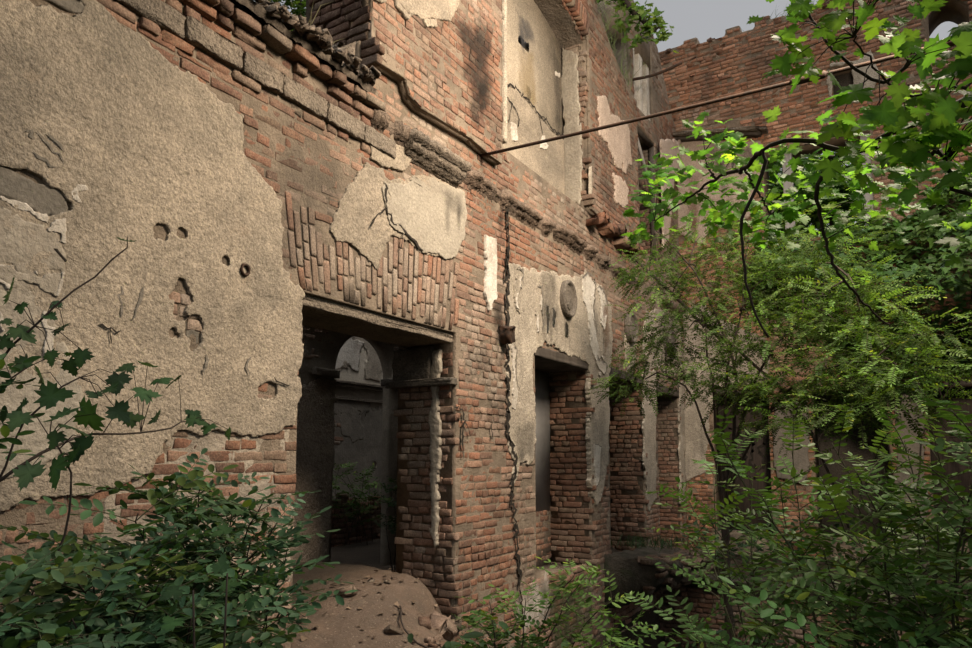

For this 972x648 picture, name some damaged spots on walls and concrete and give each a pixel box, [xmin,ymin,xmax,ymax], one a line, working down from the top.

peeling [47,0,84,13]
peeling [0,166,88,244]
crack [370,184,423,250]
peeling [535,284,546,345]
peeling [582,271,608,376]
crack [454,208,523,615]
peeling [511,344,520,410]
flaking render [100,429,294,607]